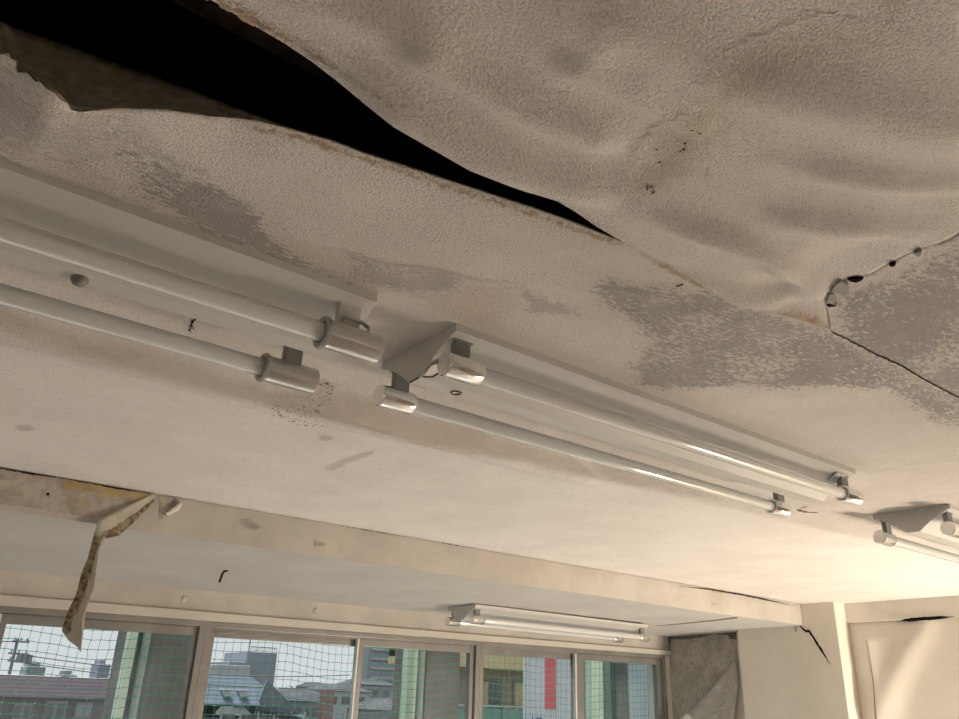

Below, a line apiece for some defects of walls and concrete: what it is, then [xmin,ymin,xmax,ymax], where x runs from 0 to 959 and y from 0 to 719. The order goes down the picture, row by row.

peeling [89,127,474,299]
crack [832,332,959,398]
peeling [0,468,183,652]
flaking render [668,632,739,719]
crack [800,625,830,664]